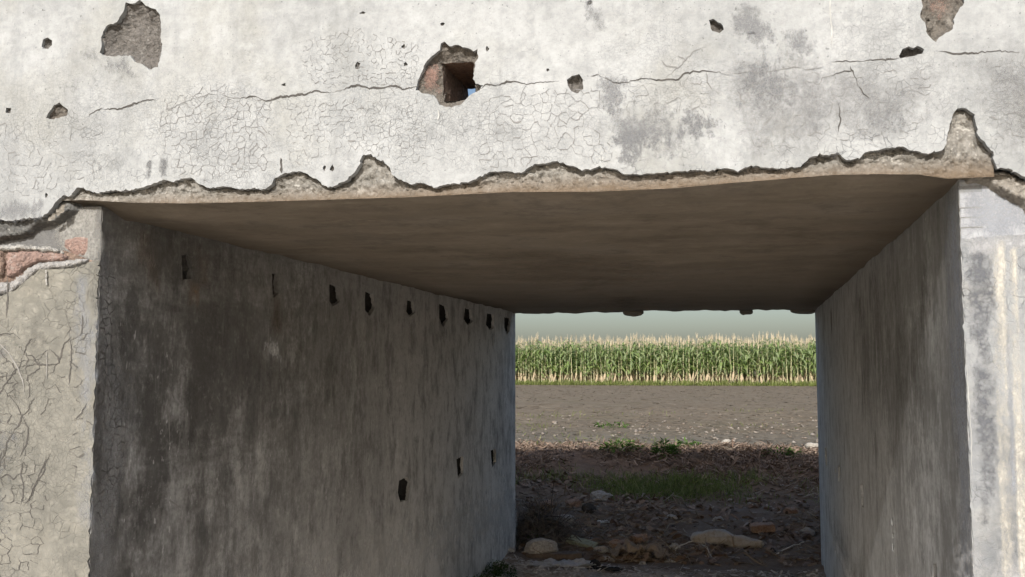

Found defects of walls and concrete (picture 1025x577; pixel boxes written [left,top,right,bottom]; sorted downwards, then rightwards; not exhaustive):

spalling [102,2,162,70]
crack [0,28,429,203]
spalling [418,43,489,108]
crack [477,47,1025,170]
spalling [899,48,923,58]
spalling [920,0,963,42]
spalling [329,284,337,304]
spalling [0,110,1025,296]
water stain [969,191,1025,346]
crack [0,265,126,576]
water stain [948,203,971,577]
water stain [999,387,1025,577]